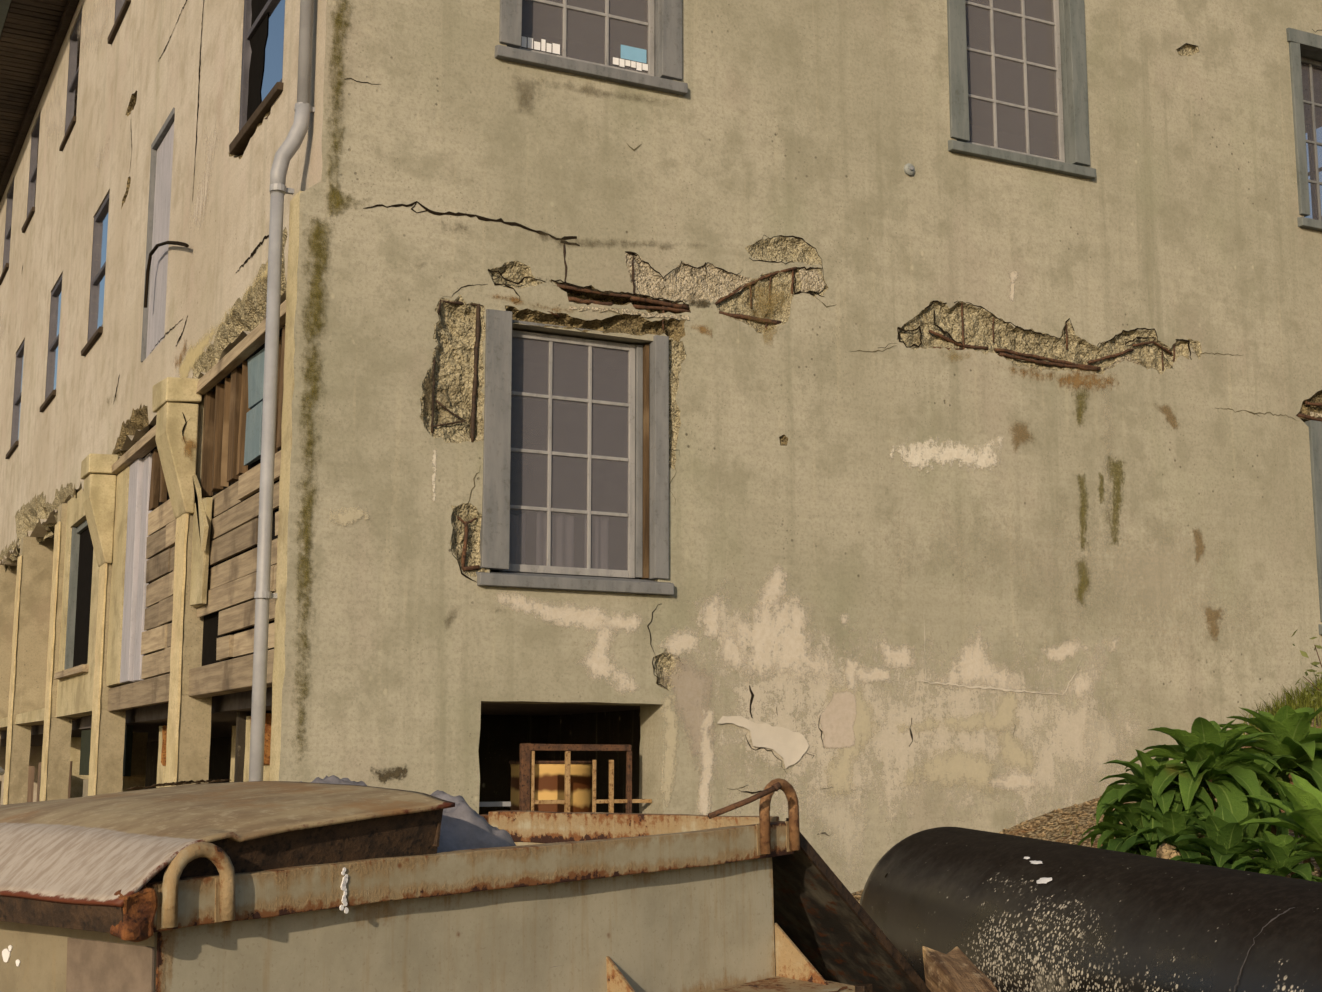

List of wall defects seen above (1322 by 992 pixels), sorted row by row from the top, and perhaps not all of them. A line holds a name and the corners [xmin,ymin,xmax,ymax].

spalling [179,227,288,379]
crack [236,235,269,273]
crack [363,201,577,240]
spalling [420,235,828,502]
leakage [890,424,1032,472]
spalling [879,300,1202,375]
spalling [1296,390,1322,422]
spalling [0,483,78,573]
spalling [450,470,487,582]
leakage [1075,459,1123,604]
peeling [652,649,684,807]
peeling [698,691,856,815]